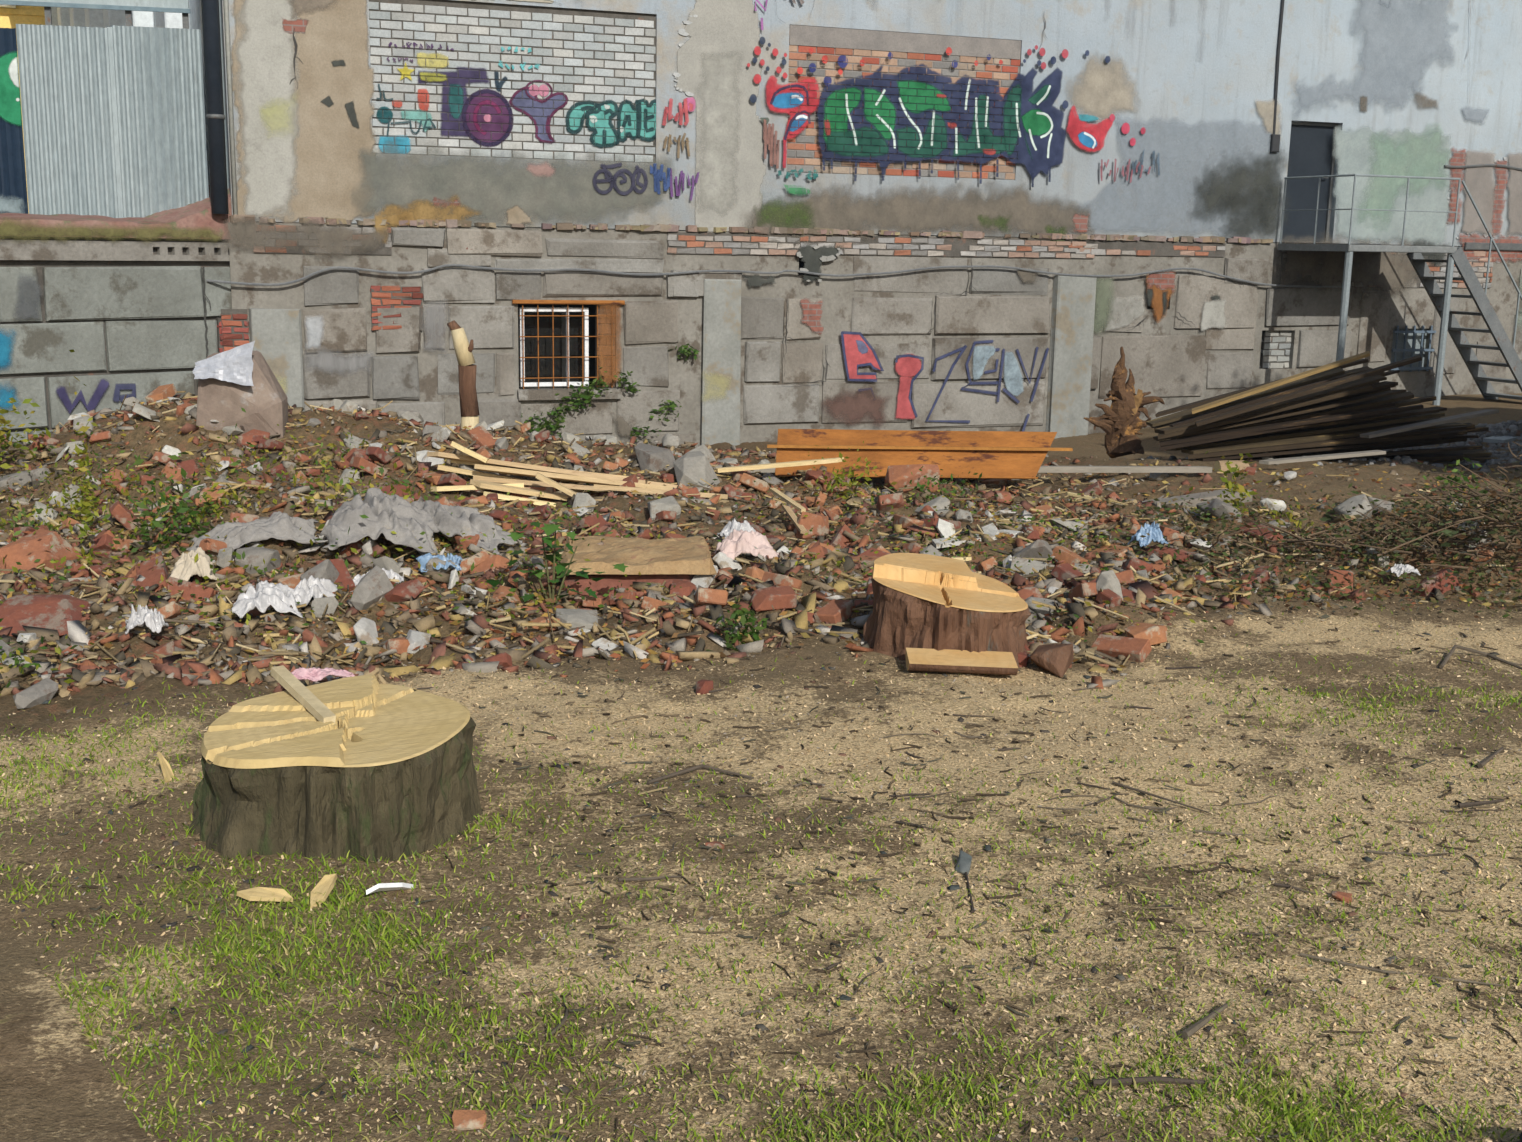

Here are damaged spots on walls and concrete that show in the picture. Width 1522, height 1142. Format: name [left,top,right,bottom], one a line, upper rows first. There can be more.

peeling [231,0,375,223]
leakage [1229,195,1262,237]
spalling [1414,148,1522,265]